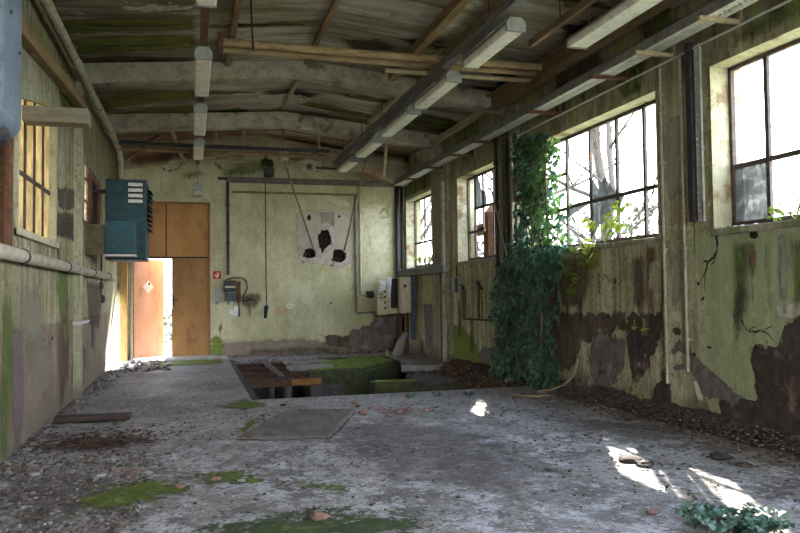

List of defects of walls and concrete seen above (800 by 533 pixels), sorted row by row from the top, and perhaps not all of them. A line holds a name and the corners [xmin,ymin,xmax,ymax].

peeling [296,192,391,268]
crack [700,236,719,290]
water stain [87,282,102,348]
spalling [324,317,396,351]
water stain [735,267,746,330]
crack [741,320,774,341]
spalling [551,301,800,435]